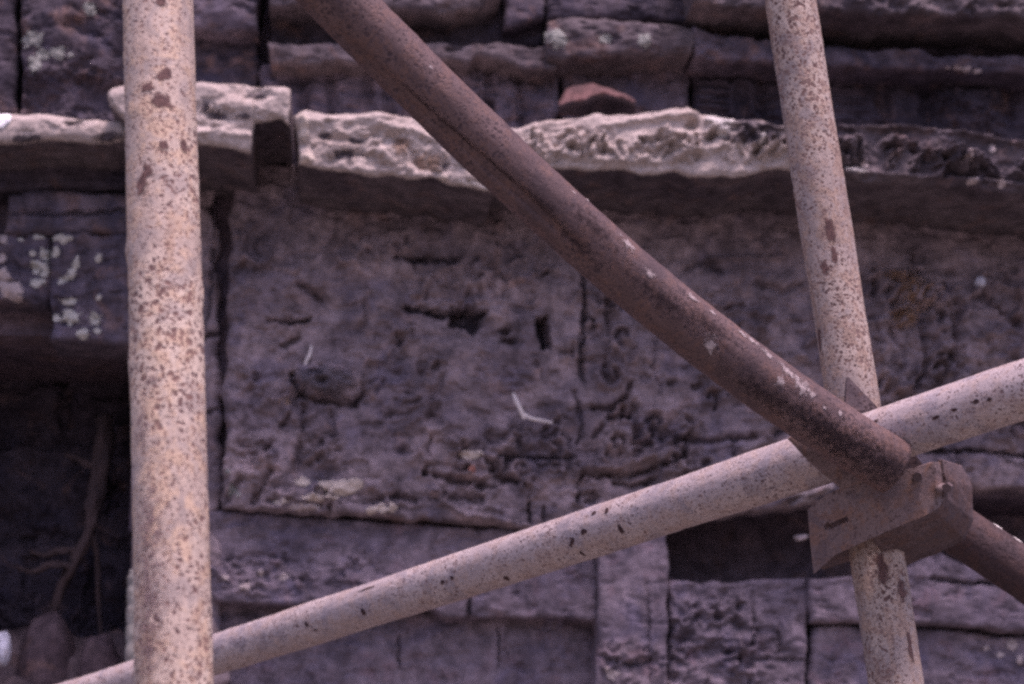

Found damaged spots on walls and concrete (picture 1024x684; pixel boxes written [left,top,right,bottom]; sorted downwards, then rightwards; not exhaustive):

spalling [298,113,315,164]
spalling [437,175,487,190]